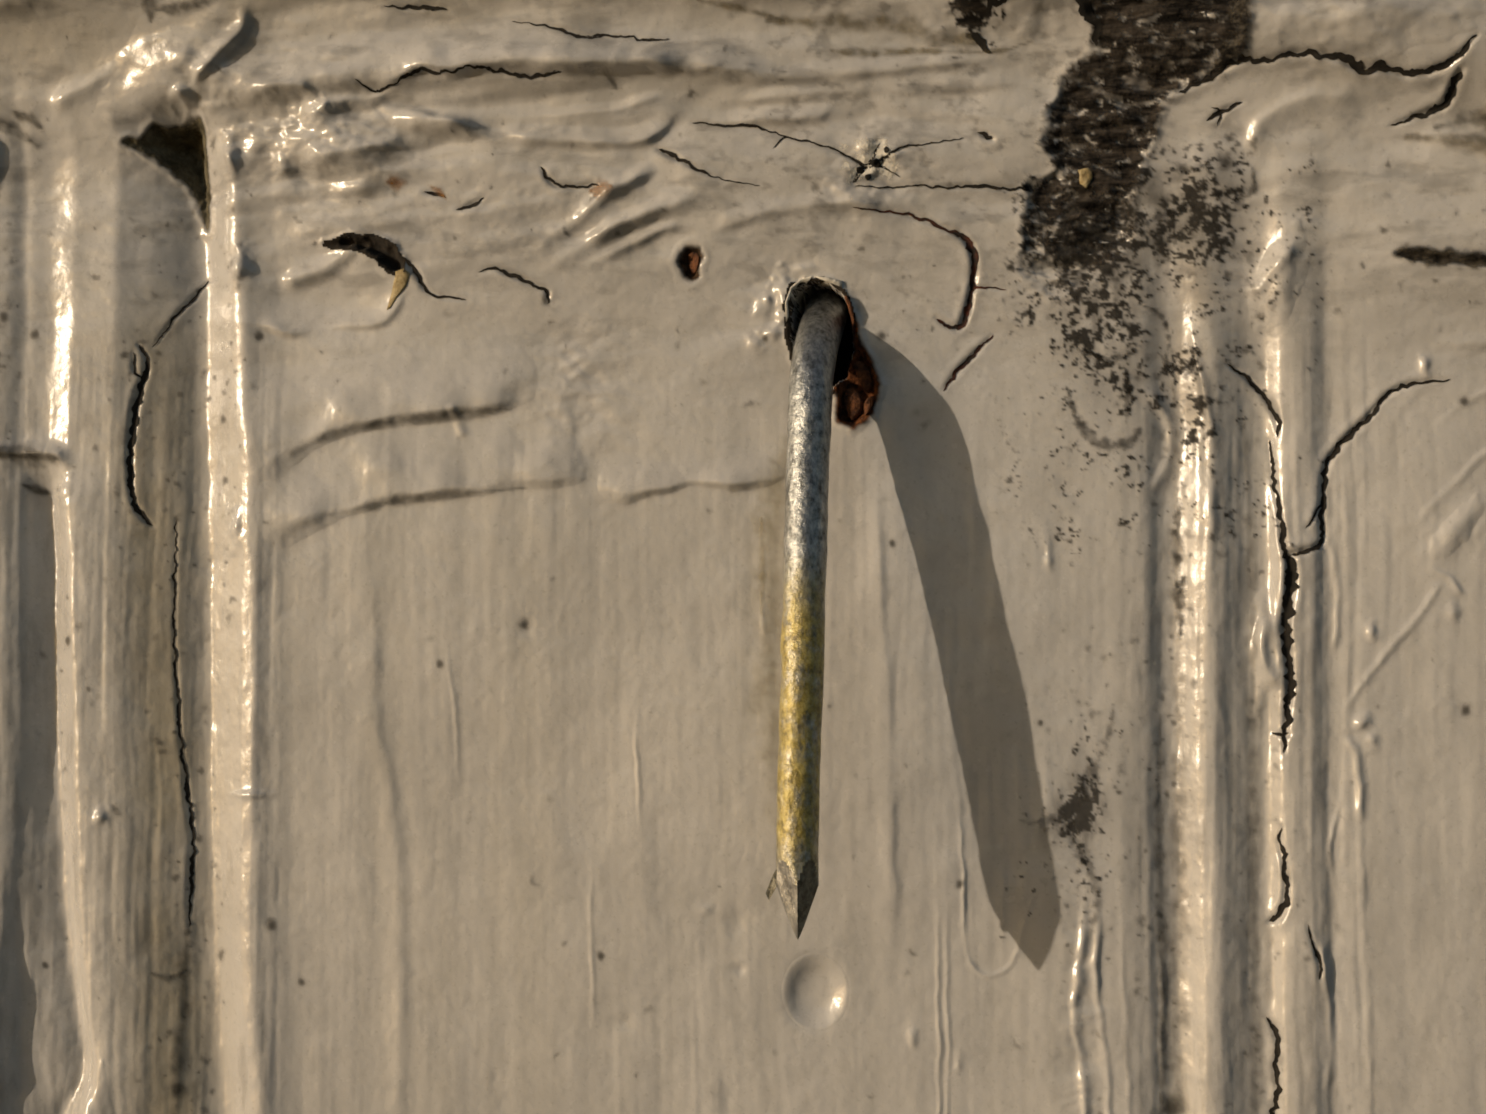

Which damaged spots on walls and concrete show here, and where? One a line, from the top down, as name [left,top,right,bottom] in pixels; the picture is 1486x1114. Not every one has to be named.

crack [385,3,447,11]
peeling [949,0,1007,54]
crack [659,149,760,186]
peeling [1021,0,1252,285]
peeling [322,232,410,309]
crack [694,122,1028,391]
peeling [1393,246,1486,268]
rust [834,295,880,429]
crack [126,281,209,927]
crack [1228,364,1450,753]
crack [1269,828,1323,980]
crack [1266,1017,1283,1114]